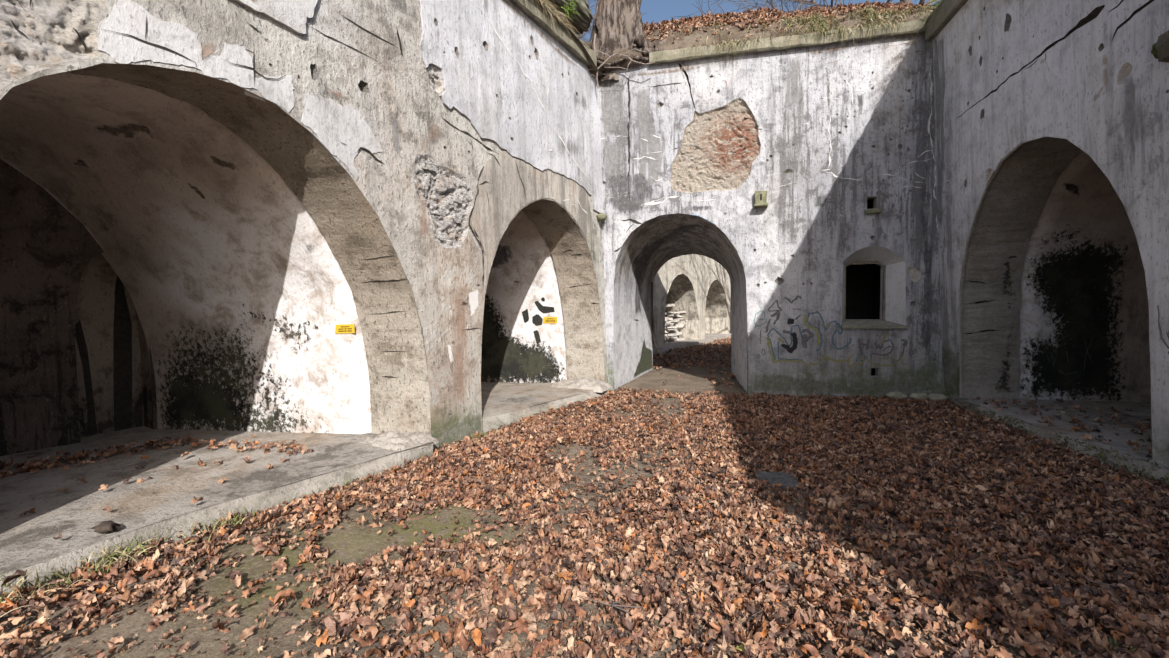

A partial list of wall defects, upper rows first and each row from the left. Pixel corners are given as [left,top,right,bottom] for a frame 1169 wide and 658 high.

spalling [0,0,109,90]
crack [956,0,1154,119]
peeling [95,123,154,139]
flaking render [670,98,761,193]
spalling [412,154,483,257]
mould [155,304,328,433]
damp [468,290,566,383]
mould [995,224,1129,401]